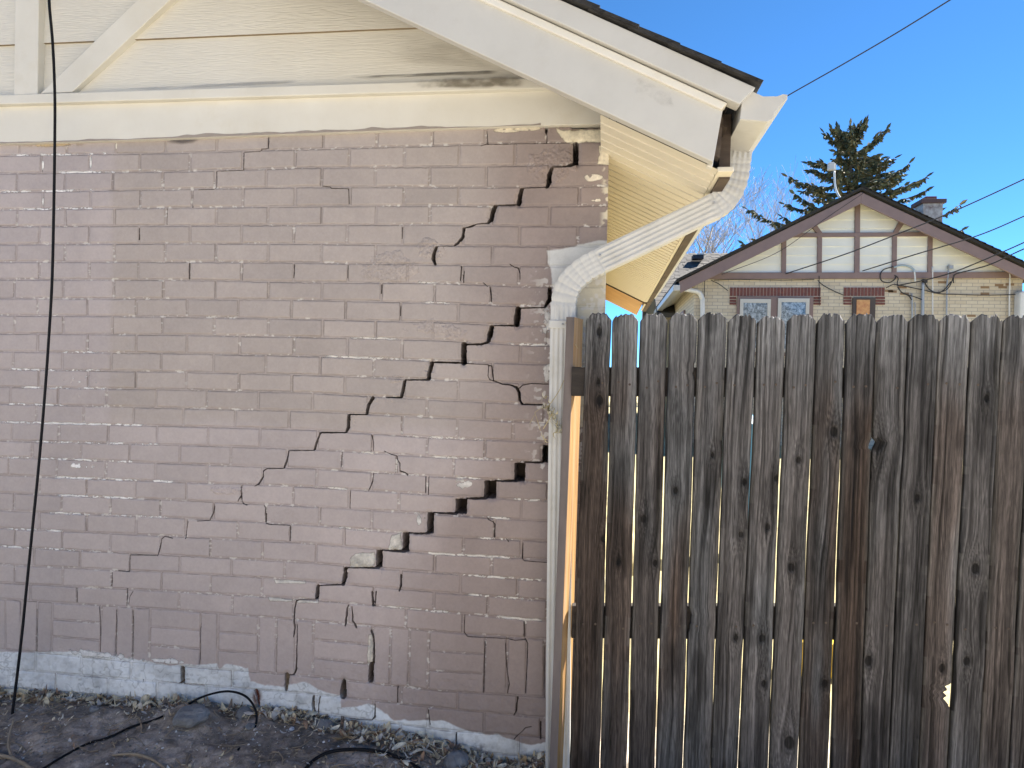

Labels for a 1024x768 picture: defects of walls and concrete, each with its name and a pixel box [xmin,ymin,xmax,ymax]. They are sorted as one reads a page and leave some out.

crack [77,133,579,676]
spalling [350,552,375,567]
spalling [388,533,402,550]
crack [464,617,545,740]